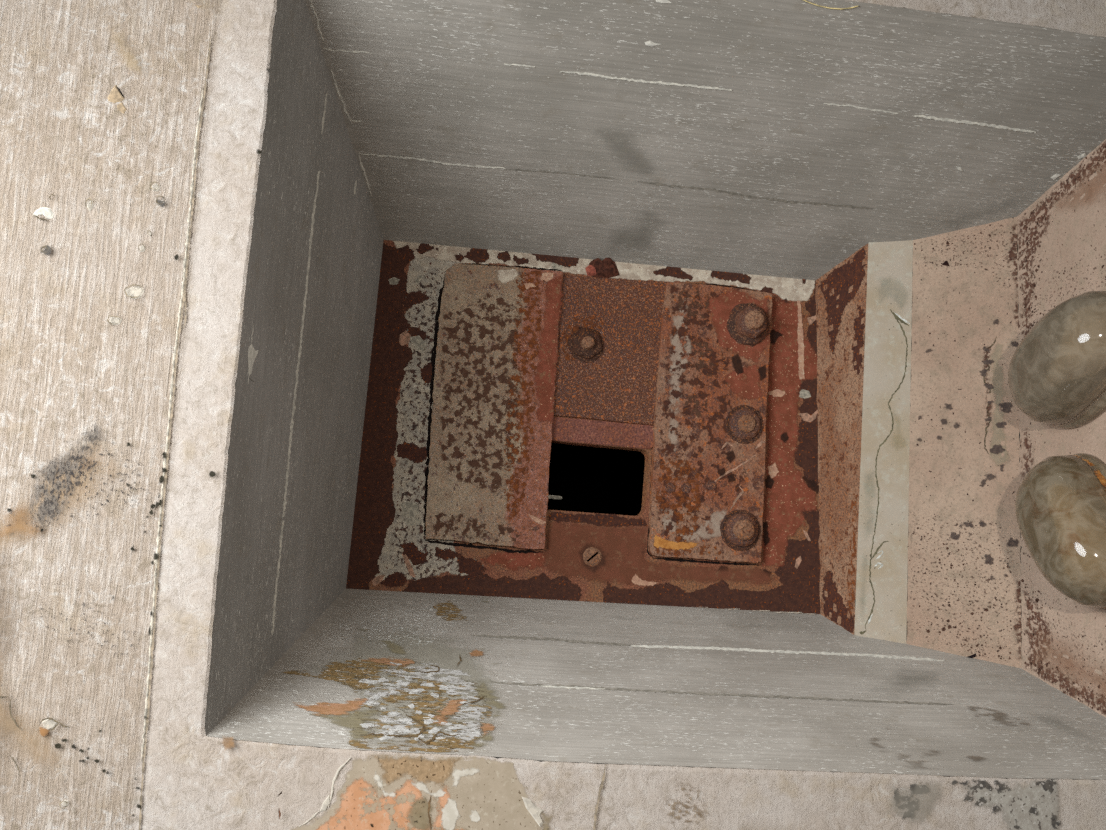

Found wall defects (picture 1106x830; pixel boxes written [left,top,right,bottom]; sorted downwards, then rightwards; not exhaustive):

corrosion [1037,143,1106,206]
corrosion [802,248,866,375]
corrosion [346,243,789,601]
corrosion [794,378,818,484]
crack [859,309,910,634]
corrosion [602,494,858,633]
peeling [283,602,504,827]
corrosion [1031,587,1106,714]